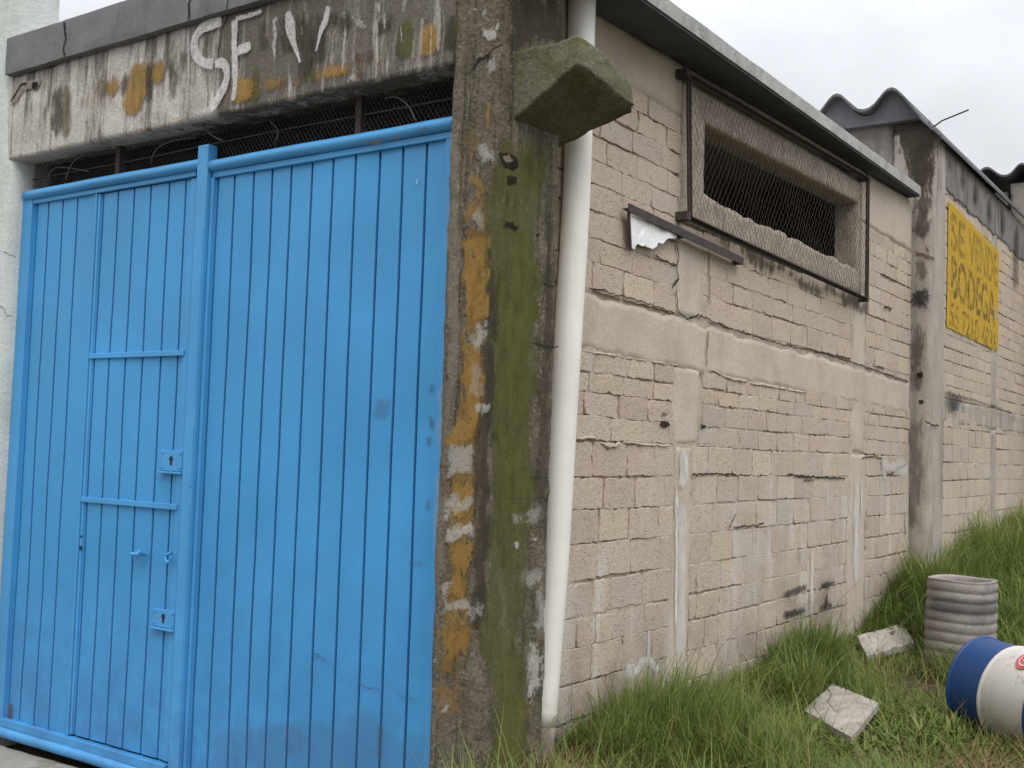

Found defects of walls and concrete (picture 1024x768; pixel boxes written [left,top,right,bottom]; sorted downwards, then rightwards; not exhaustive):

crack [60,22,68,57]
peeling [482,23,499,40]
damp [50,86,70,137]
damp [890,120,941,237]
crack [589,240,908,382]
peeling [434,171,491,685]
damp [471,219,552,626]
crack [692,470,736,478]
crack [787,473,845,482]
crack [729,514,764,529]
damp [785,552,834,619]
damp [524,642,545,697]